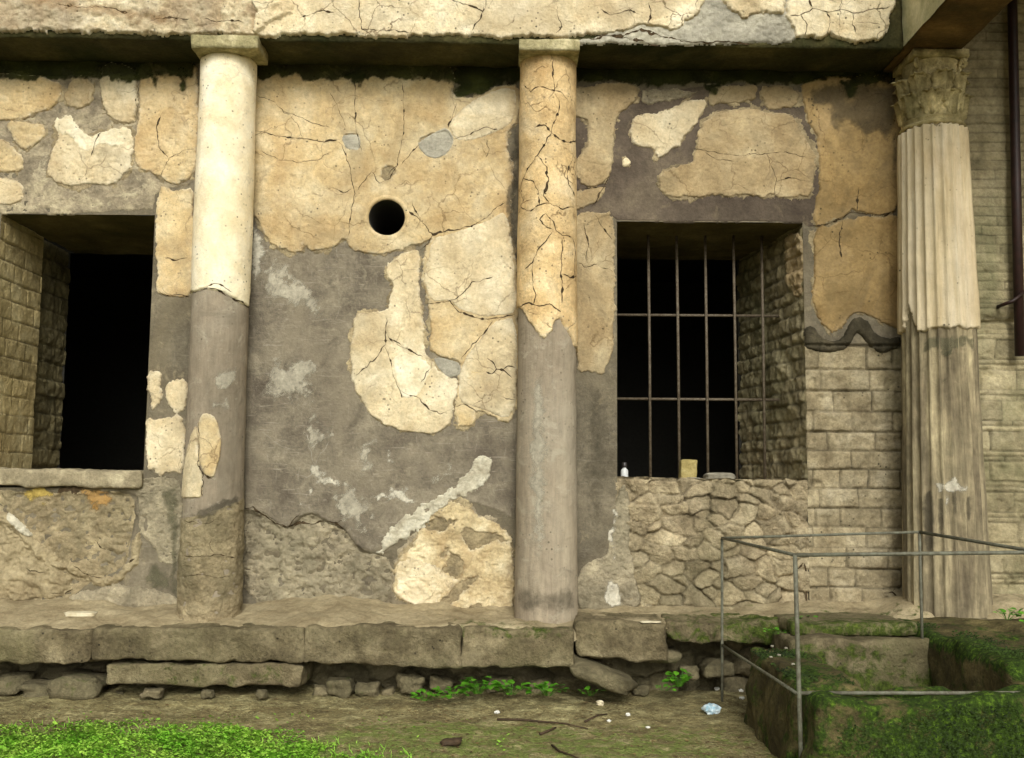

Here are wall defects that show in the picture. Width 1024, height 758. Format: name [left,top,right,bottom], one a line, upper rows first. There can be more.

crack [300,2,408,34]
crack [453,0,485,29]
crack [591,2,749,46]
crack [792,0,890,34]
crack [259,84,417,236]
crack [409,62,611,400]
crack [816,188,896,257]
crack [357,322,479,414]
peeling [0,53,981,623]
crack [245,506,345,530]